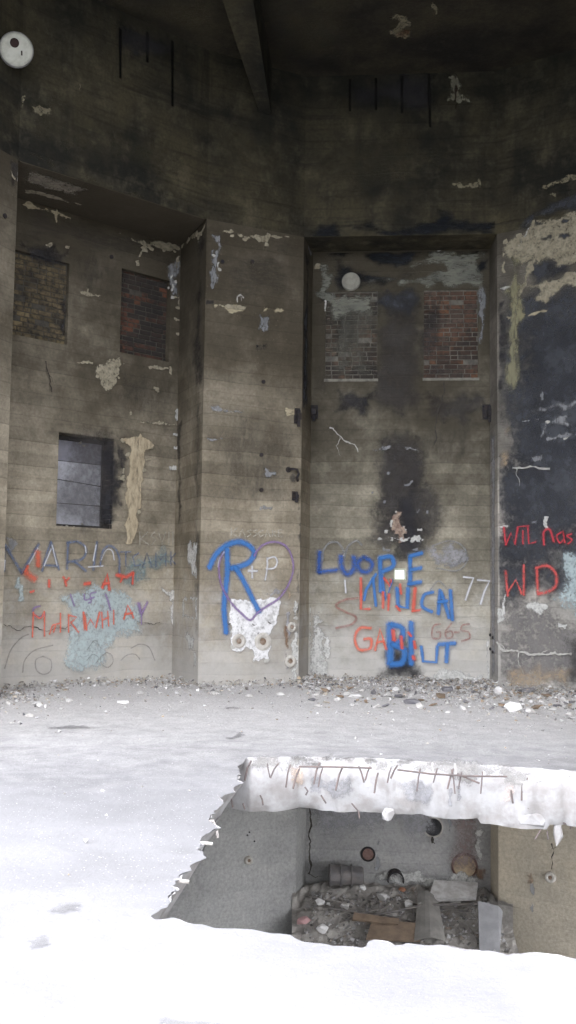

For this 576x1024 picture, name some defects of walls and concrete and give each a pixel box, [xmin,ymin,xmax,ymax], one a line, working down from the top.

spalling [119,224,289,299]
leakage [500,211,576,389]
peeling [77,357,125,391]
peeling [119,434,154,544]
crack [330,427,358,455]
spalling [378,501,424,552]
crack [512,465,550,485]
peeling [229,589,299,679]
crack [308,809,322,878]
spalling [151,756,576,925]